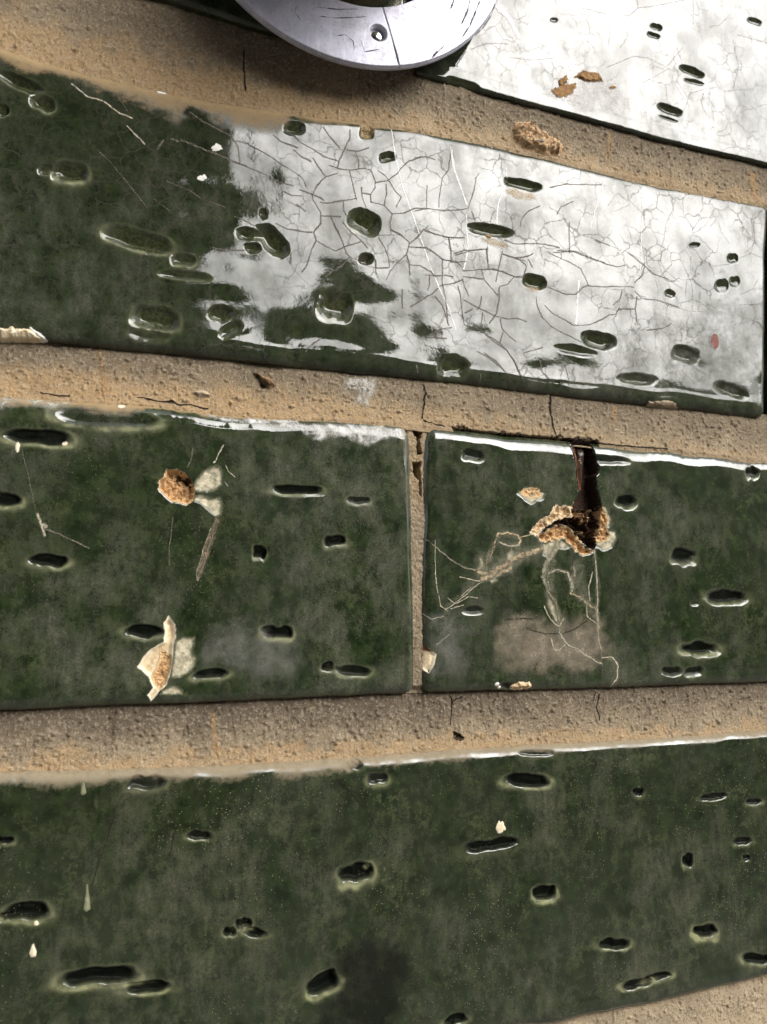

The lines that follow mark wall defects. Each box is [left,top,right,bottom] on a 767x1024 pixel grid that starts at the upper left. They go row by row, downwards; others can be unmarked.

spalling [551,70,616,98]
crack [71,83,702,449]
peeling [159,466,222,580]
peeling [518,487,545,504]
spalling [530,444,636,556]
peeling [125,616,229,701]
crack [426,532,619,725]